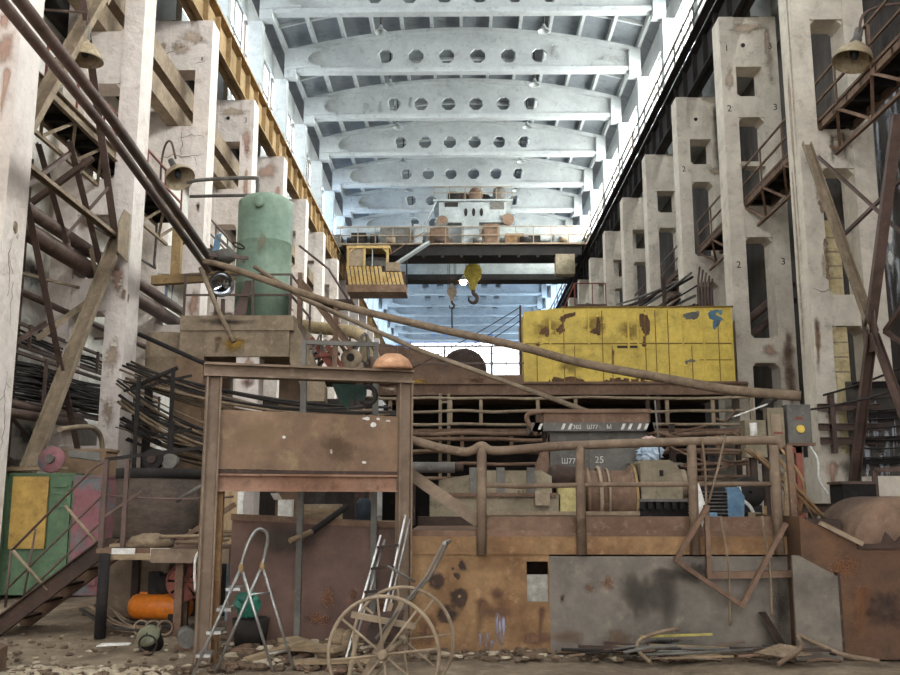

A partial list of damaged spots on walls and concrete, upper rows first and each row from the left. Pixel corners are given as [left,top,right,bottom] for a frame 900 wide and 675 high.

crack [160,133,204,164]
rust [765,335,794,390]